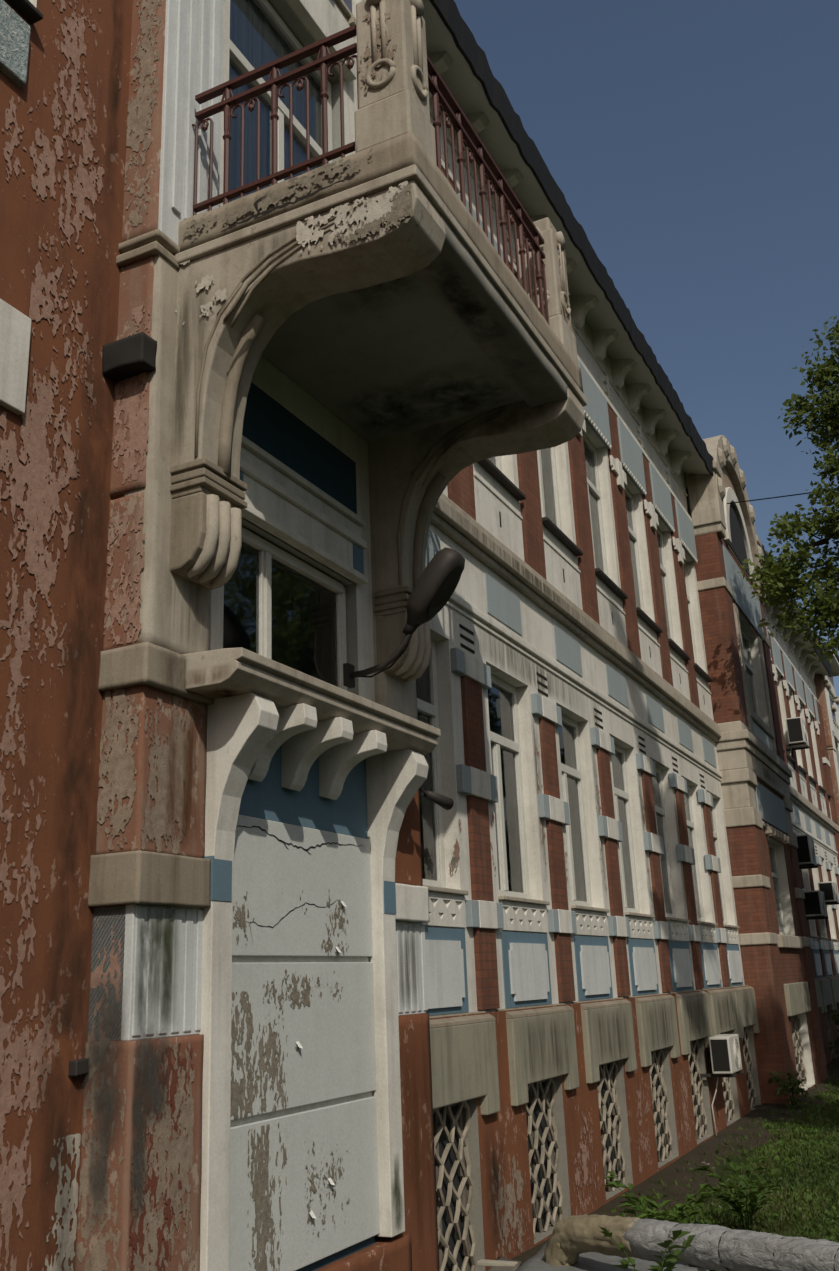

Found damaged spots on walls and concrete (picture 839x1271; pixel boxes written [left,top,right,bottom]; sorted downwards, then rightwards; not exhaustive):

spalling [183,148,373,239]
spalling [296,181,413,254]
spalling [195,275,227,322]
peeling [0,0,197,1271]
crack [236,825,363,854]
crack [246,901,340,940]